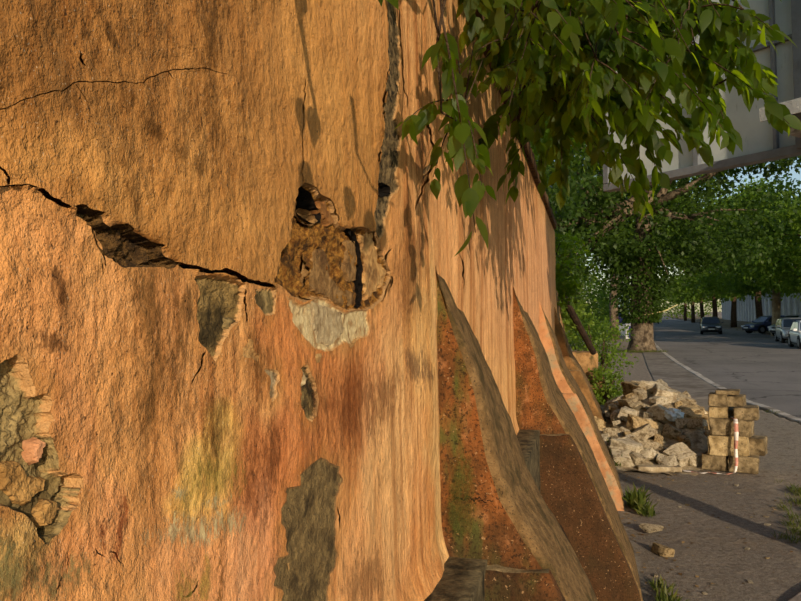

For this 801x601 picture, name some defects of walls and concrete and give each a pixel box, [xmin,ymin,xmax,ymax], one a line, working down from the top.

crack [158,261,265,287]
flaking render [195,183,391,422]
spalling [0,354,84,545]